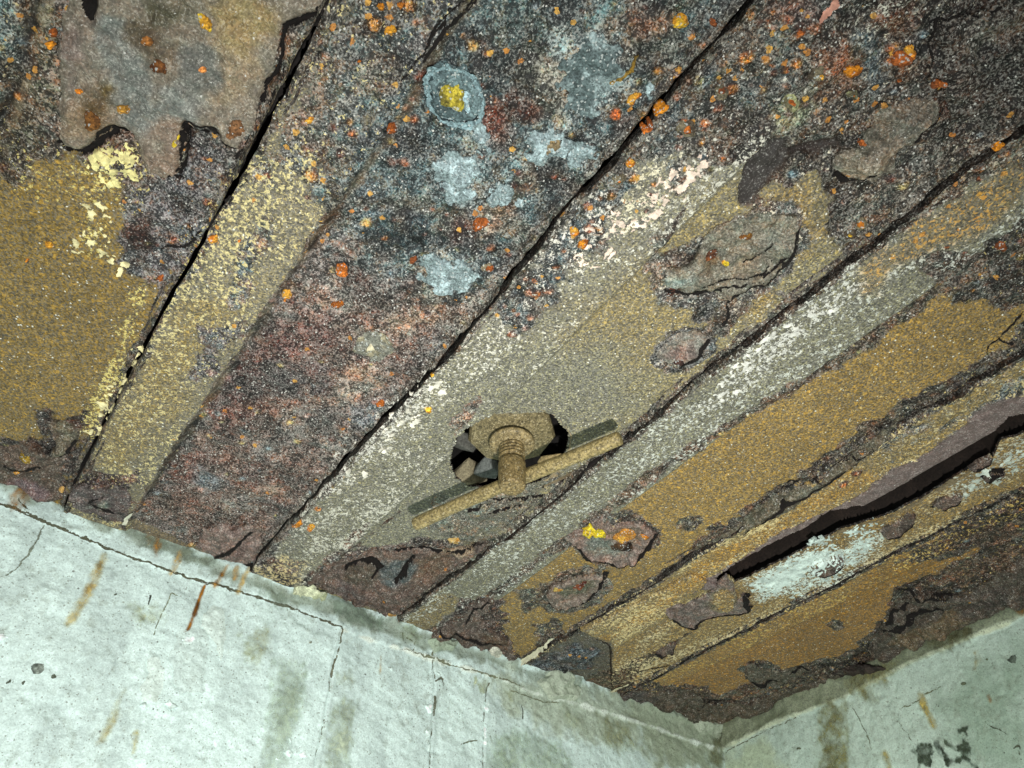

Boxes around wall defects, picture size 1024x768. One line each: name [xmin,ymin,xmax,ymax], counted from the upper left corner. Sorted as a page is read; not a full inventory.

crack [400,0,477,87]
rust [54,0,326,179]
rust [422,59,486,131]
water stain [424,121,524,208]
water stain [524,127,600,170]
water stain [415,252,483,296]
peeling [713,303,838,402]
crack [467,457,604,515]
peeling [953,450,1024,499]
crack [0,498,344,691]
rust [187,516,263,631]
peeling [747,517,884,599]